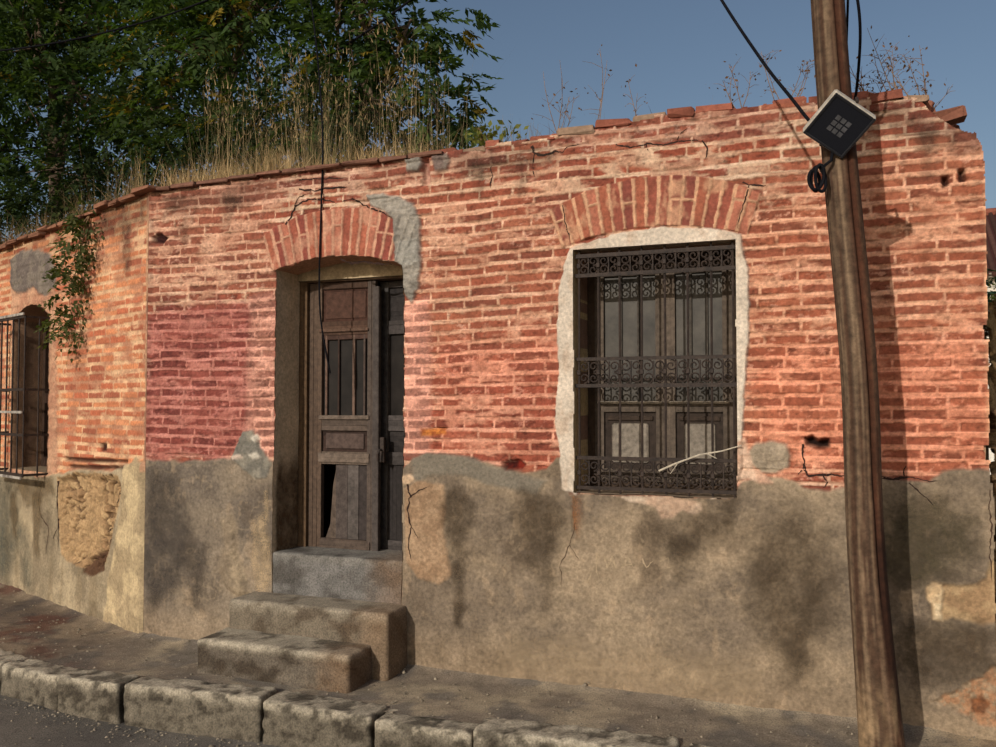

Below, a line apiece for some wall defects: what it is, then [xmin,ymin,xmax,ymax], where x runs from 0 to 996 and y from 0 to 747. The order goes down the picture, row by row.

crack [531,144,579,175]
crack [616,128,708,160]
crack [285,177,390,225]
crack [798,444,844,488]
crack [882,466,935,505]
flaking render [57,470,122,576]
crack [407,484,427,561]
water stain [520,497,562,559]
water stain [454,593,463,624]
water stain [753,523,824,668]